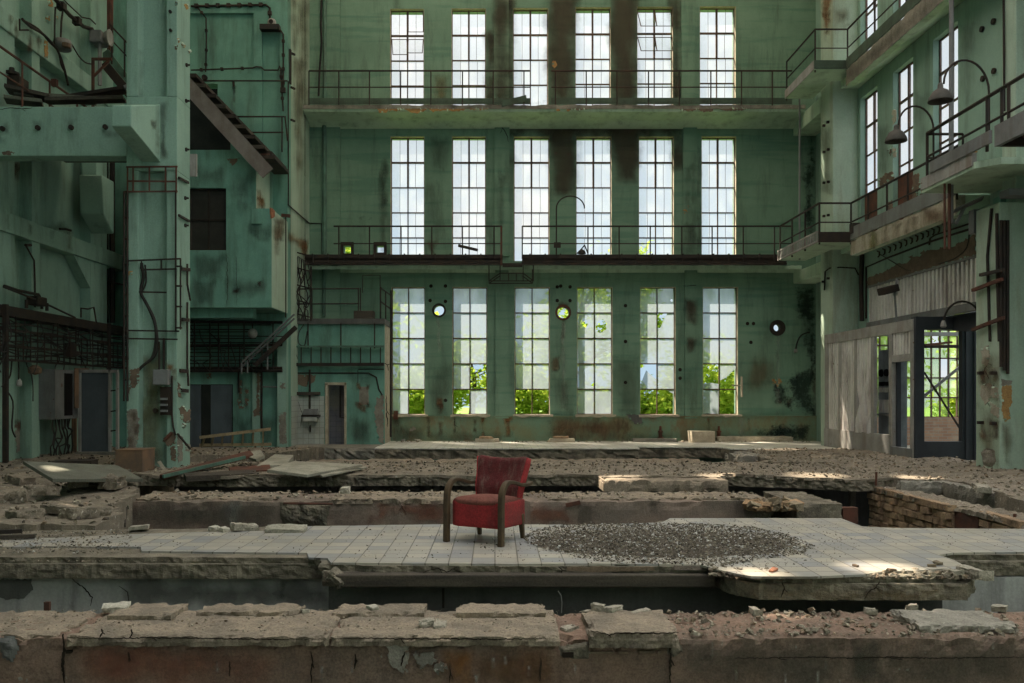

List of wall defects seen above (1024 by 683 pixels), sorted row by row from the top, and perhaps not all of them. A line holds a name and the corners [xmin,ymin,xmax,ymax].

peeling [163,382,191,463]
peeling [1001,379,1012,422]
crack [61,629,546,683]